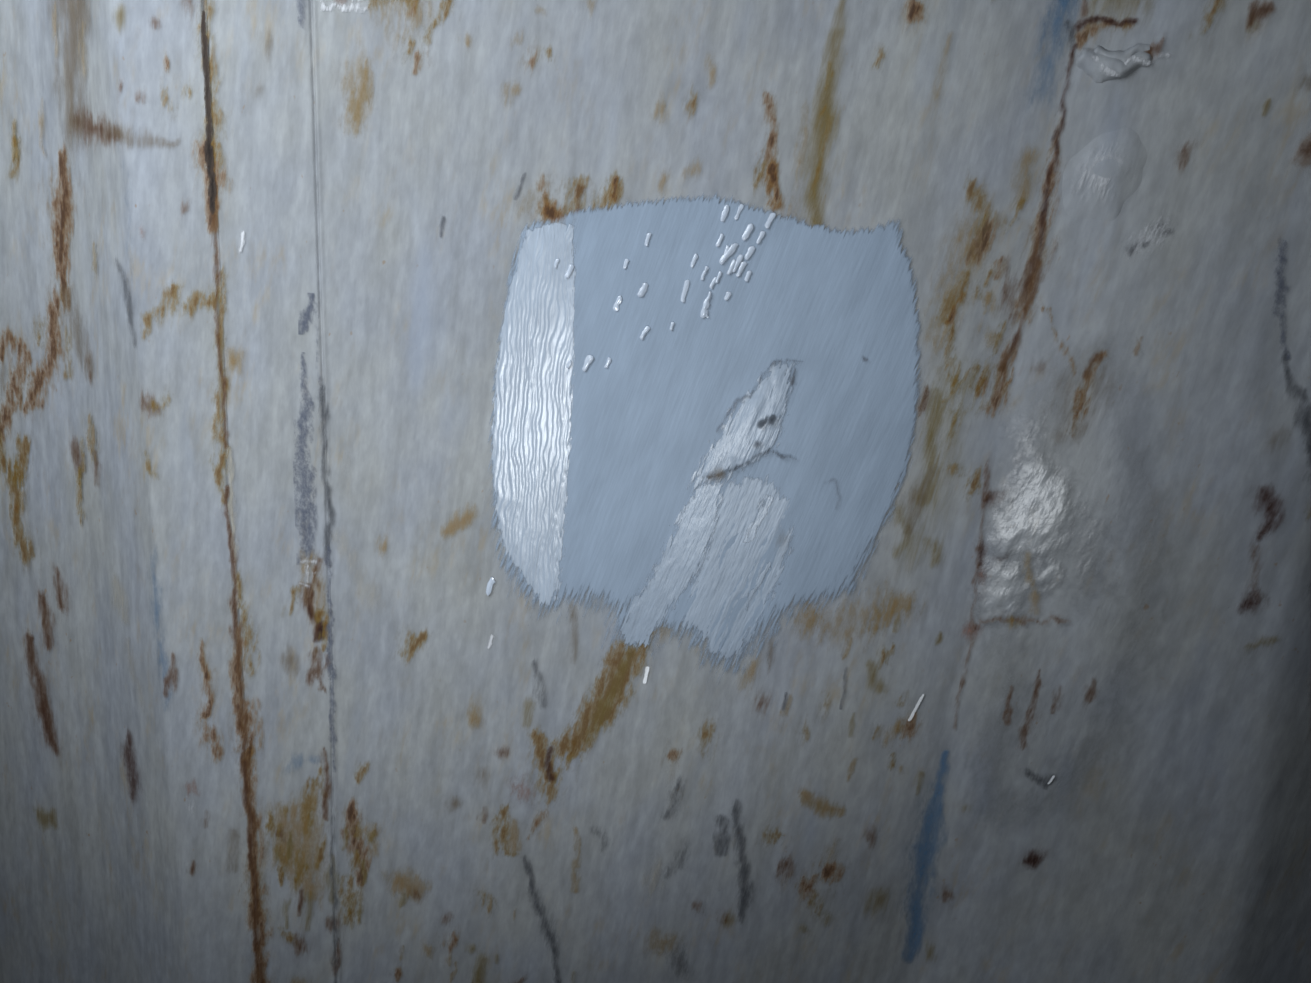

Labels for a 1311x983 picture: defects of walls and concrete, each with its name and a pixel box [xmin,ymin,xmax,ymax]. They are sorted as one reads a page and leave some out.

corrosion [809,30,839,228]
crack [986,0,1137,412]
corrosion [0,148,72,562]
corrosion [72,414,97,524]
peeling [755,415,776,446]
corrosion [977,543,1008,584]
corrosion [532,643,648,804]
corrosion [326,801,377,929]